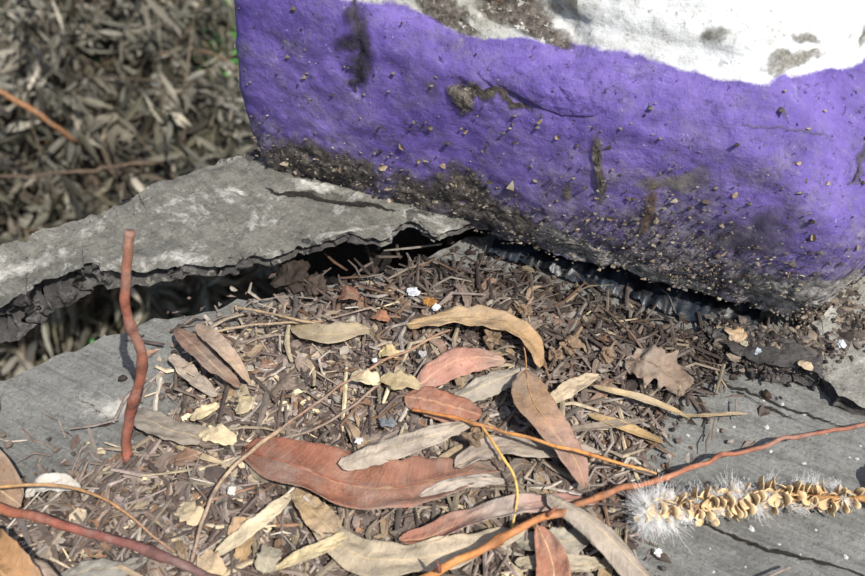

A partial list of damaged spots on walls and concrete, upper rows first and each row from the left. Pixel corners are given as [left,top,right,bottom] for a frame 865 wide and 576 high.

crack [338,0,371,92]
crack [848,149,865,185]
crack [266,187,395,211]